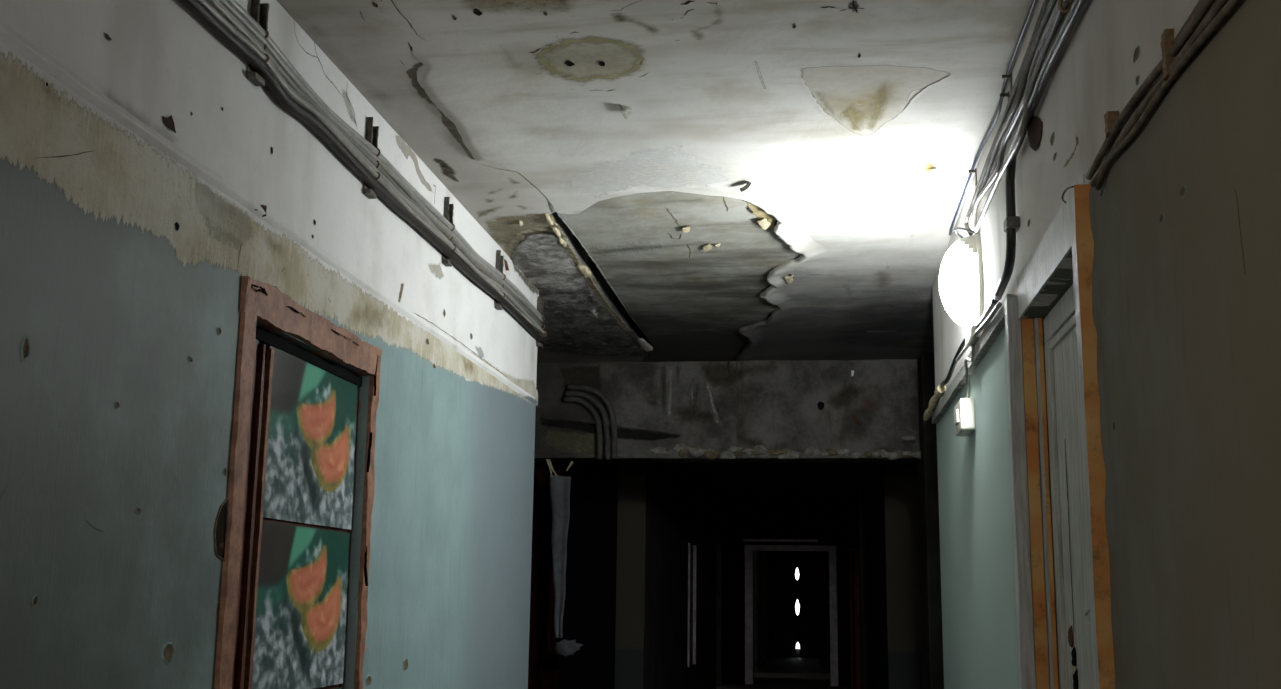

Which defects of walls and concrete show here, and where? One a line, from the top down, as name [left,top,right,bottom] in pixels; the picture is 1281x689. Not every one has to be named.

peeling [0,52,538,406]
crack [360,0,425,66]
water stain [529,31,647,82]
peeling [407,38,828,362]